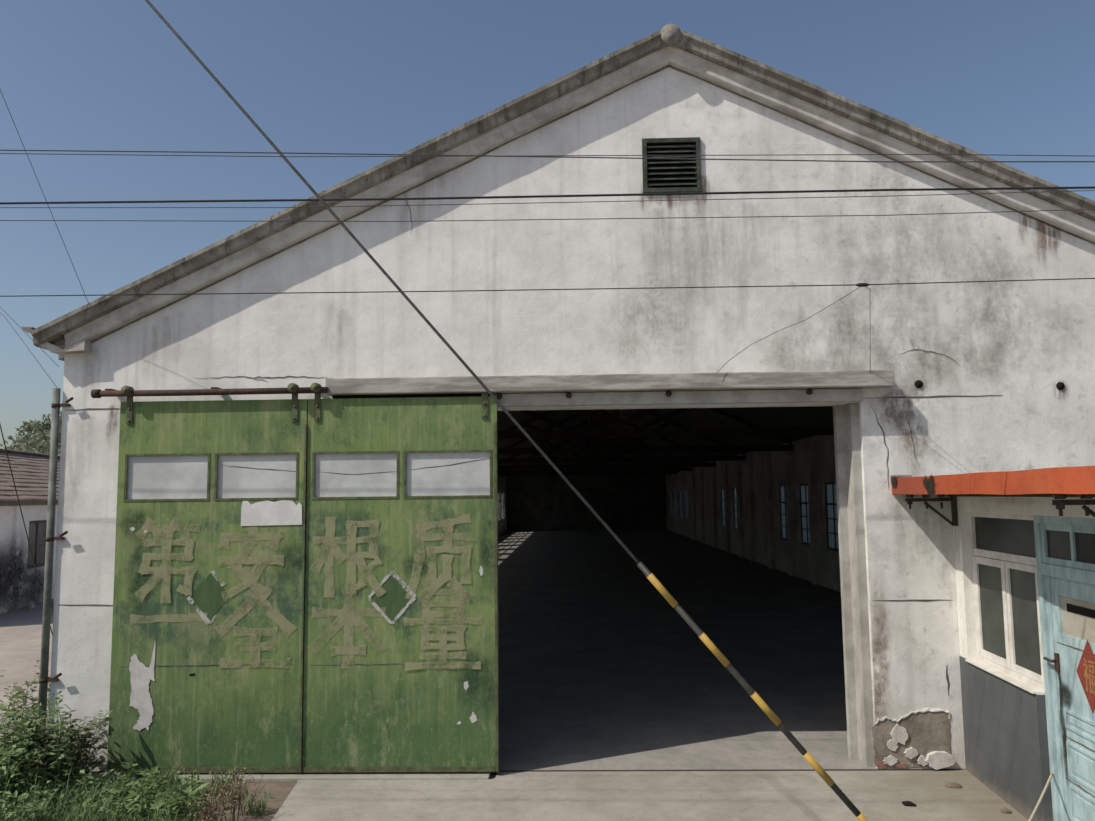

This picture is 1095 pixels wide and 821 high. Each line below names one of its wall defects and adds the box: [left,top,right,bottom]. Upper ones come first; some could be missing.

rust [1025,220,1057,249]
crack [198,375,326,383]
crack [868,403,918,488]
flaking render [872,708,956,770]